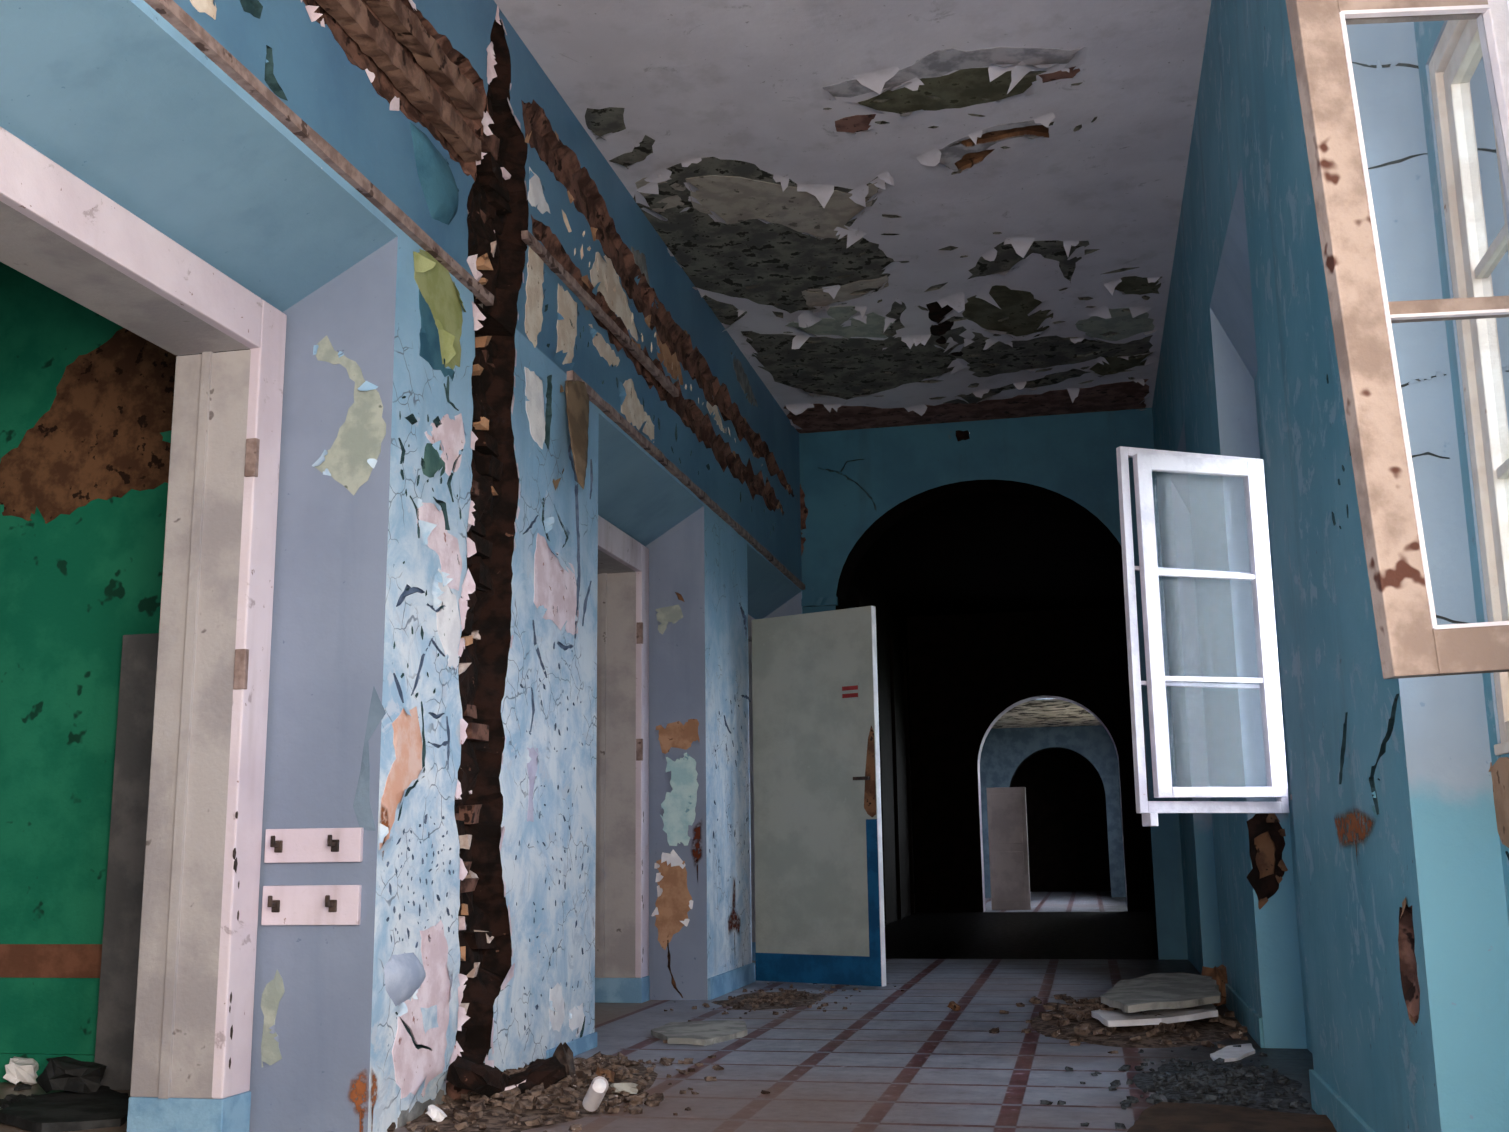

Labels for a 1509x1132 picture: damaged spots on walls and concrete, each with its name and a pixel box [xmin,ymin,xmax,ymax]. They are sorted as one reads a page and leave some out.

peeling [0,328,178,526]
flaking render [300,0,1164,1128]
flaking render [1246,813,1288,909]
peeling [1489,757,1509,860]
peeling [261,970,285,1069]
flaking render [1398,897,1420,1026]